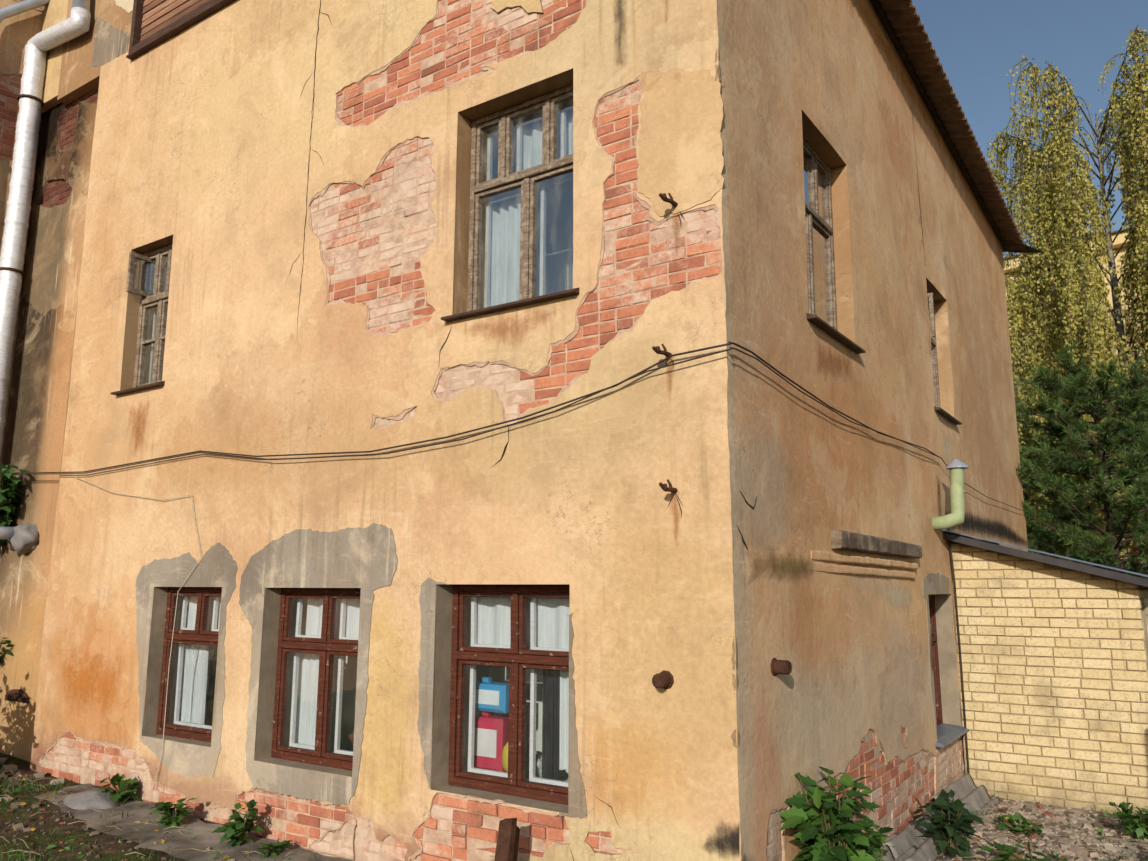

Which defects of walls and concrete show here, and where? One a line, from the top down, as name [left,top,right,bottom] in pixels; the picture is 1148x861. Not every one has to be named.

spalling [335,0,587,128]
spalling [309,136,437,337]
spalling [431,76,725,424]
spalling [370,406,417,430]
water stain [938,485,1027,545]
spalling [38,731,630,861]
water stain [706,827,745,861]
spalling [814,727,966,837]